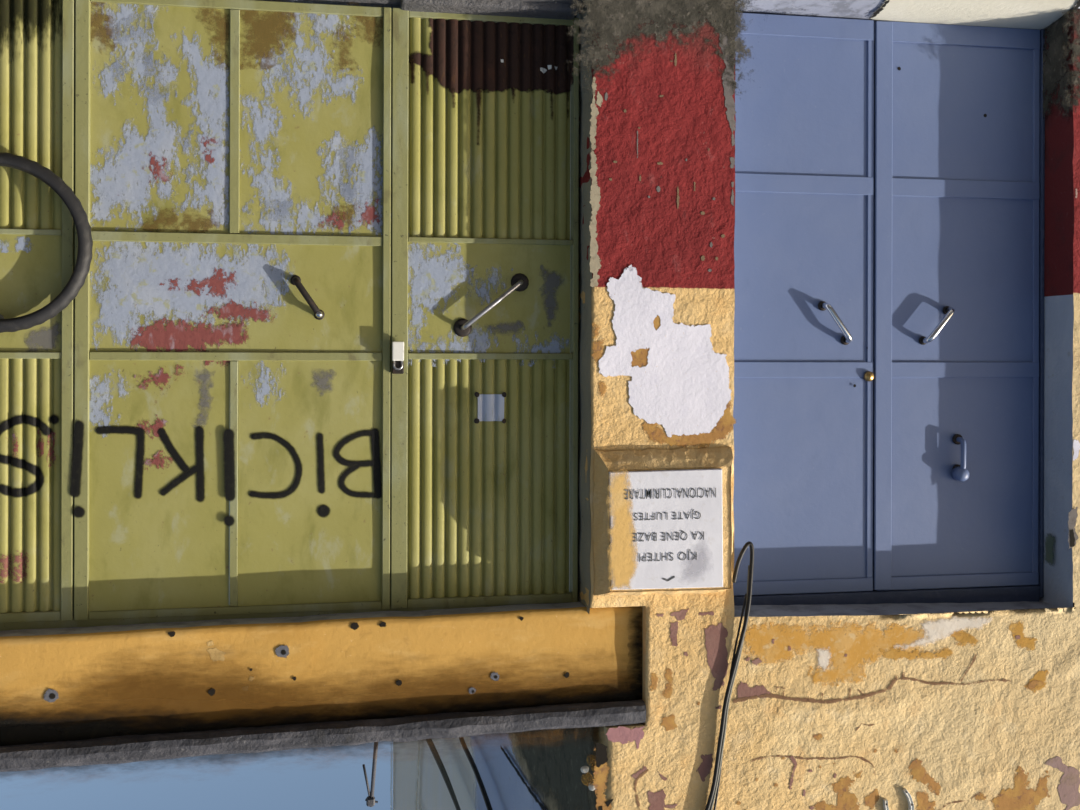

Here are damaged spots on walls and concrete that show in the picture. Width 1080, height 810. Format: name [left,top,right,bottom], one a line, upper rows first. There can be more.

damp [0,0,62,57]
rust [408,14,577,145]
damp [568,0,753,93]
damp [1043,5,1080,118]
peeling [90,2,392,350]
peeling [408,242,513,367]
peeling [642,401,736,448]
damp [0,612,643,746]
peeling [656,608,728,691]
peeling [744,620,978,686]
crack [733,655,1010,790]
peeling [975,756,1080,810]